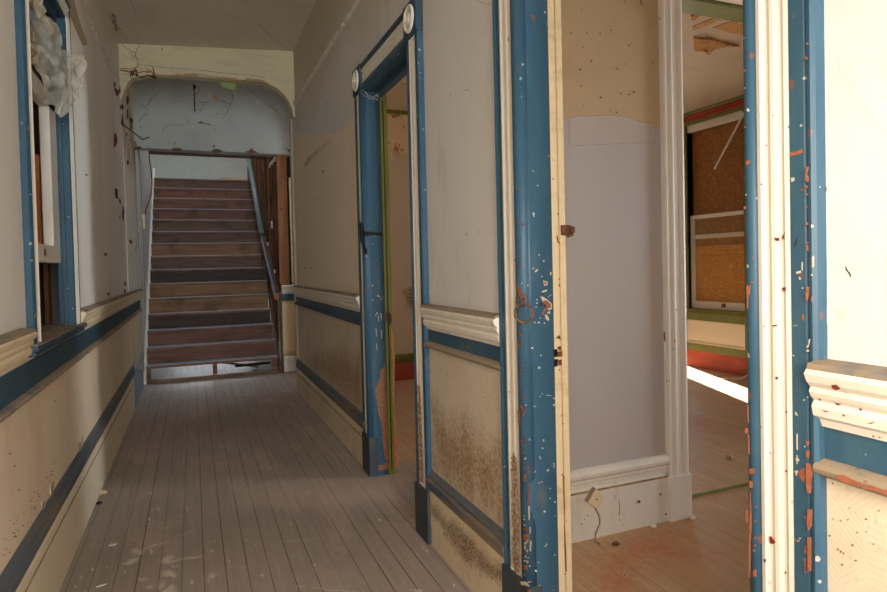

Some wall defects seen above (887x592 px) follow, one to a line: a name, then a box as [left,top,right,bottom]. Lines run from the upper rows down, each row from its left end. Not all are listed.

flaking render [691,14,745,55]
crack [120,44,287,132]
peeling [515,254,552,324]
peeling [796,242,814,301]
leakage [294,302,363,412]
leakage [416,377,520,592]
peeling [520,436,551,592]
leakage [530,473,554,528]
peeling [746,468,757,577]
peeling [785,434,813,494]
peeling [794,509,812,573]
peeling [832,475,887,495]